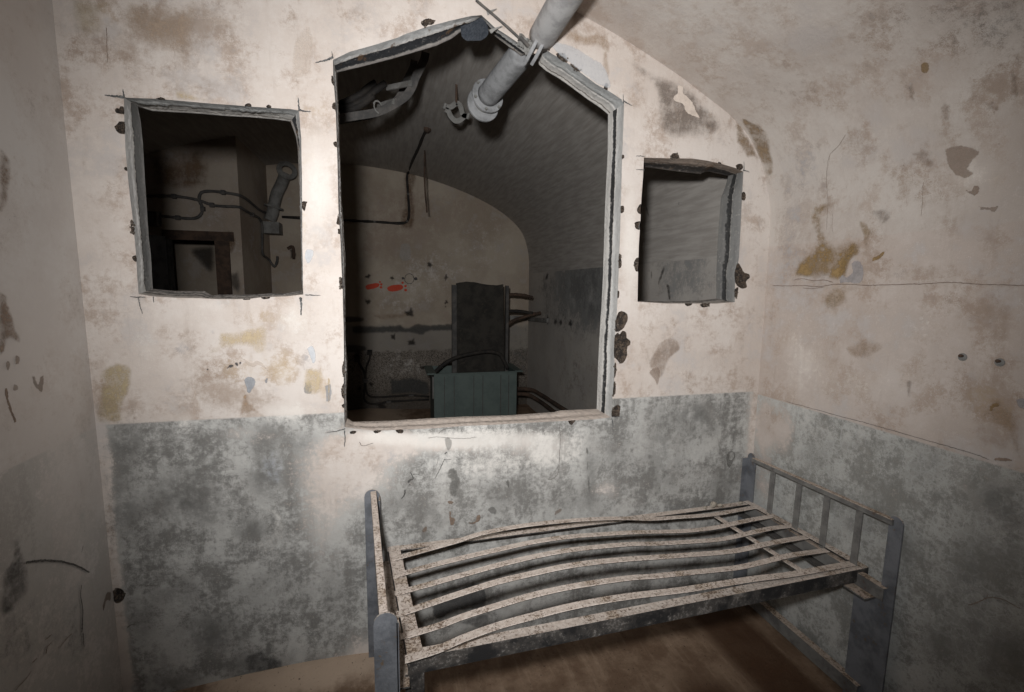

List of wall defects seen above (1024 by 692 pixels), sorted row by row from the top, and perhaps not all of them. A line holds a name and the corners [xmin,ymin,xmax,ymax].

peeling [673,85,699,118]
crack [773,278,1024,289]
spalling [611,311,630,417]